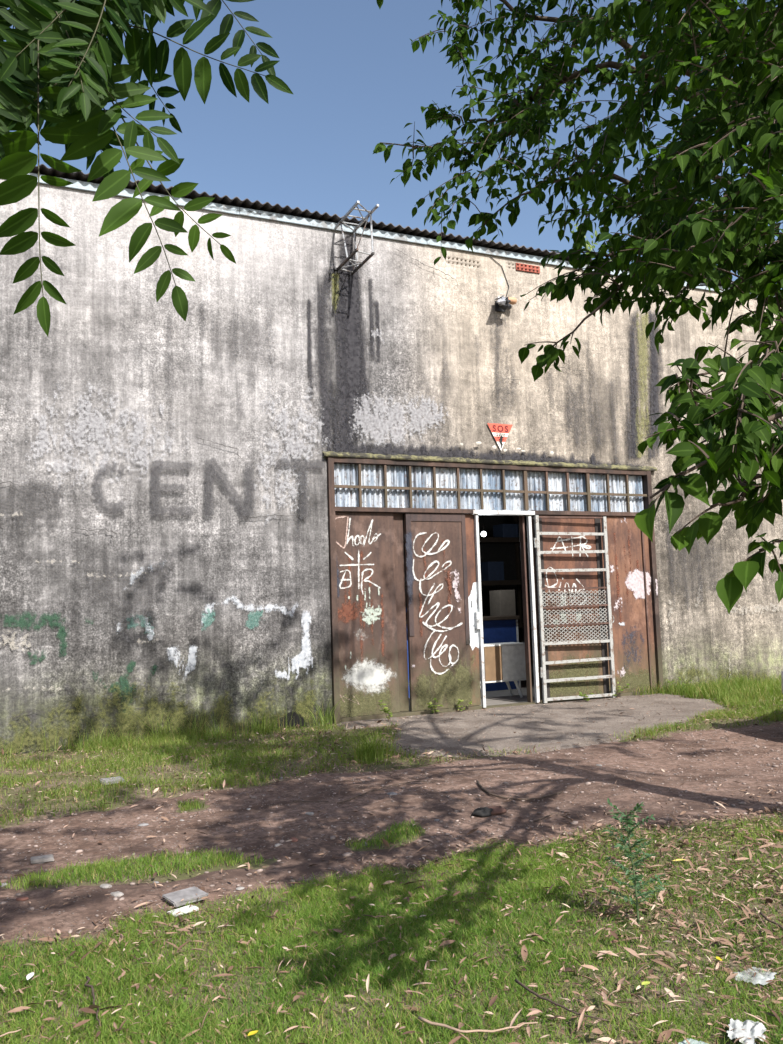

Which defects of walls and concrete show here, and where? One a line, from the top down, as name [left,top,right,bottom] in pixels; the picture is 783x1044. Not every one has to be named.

leakage [254,235,663,521]
corrosion [338,551,384,664]